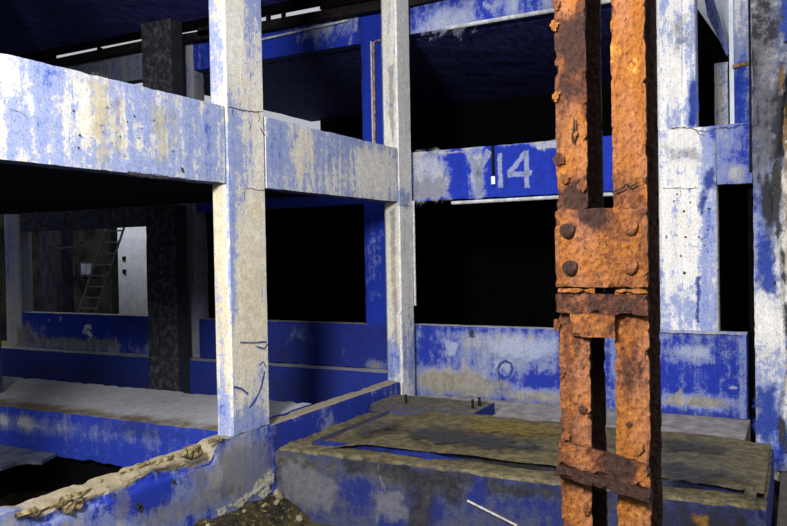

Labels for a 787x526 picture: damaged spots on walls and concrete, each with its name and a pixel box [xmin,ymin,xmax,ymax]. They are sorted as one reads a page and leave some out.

peeling [127,167,189,181]
corrosion [553,152,587,192]
spalling [119,437,228,475]
spalling [14,488,92,518]